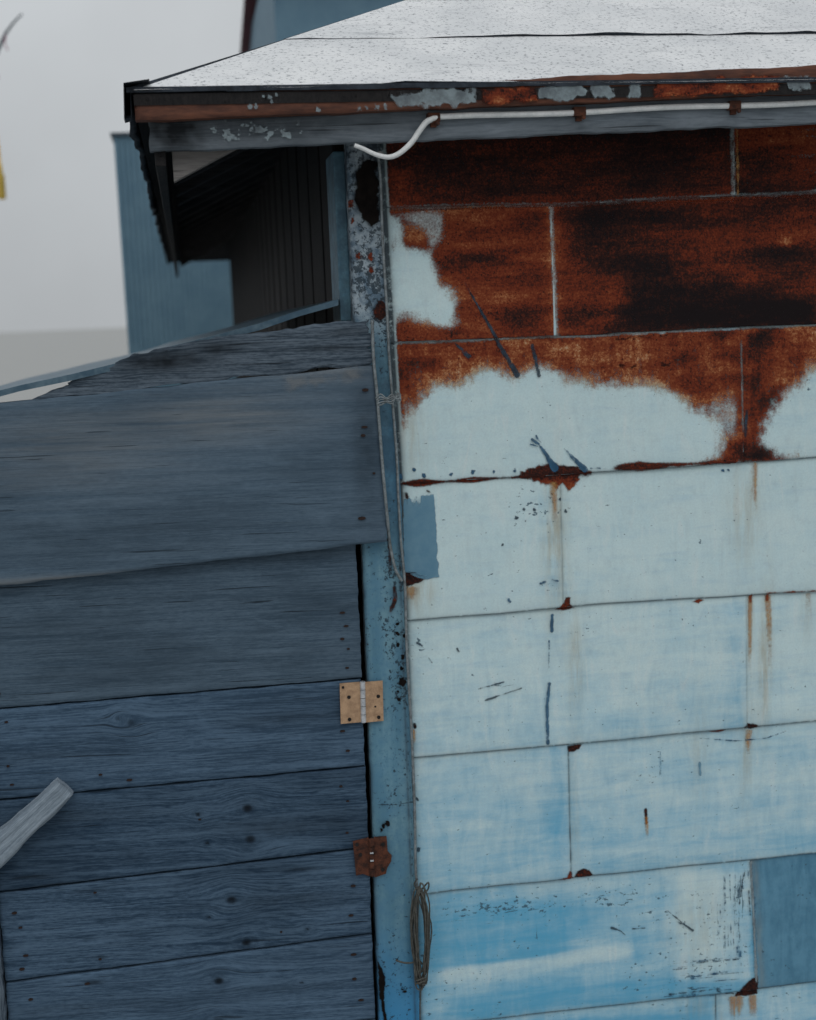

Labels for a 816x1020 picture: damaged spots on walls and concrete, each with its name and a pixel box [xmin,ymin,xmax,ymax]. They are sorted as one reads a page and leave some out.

peeling [358,87,476,110]
peeling [538,85,615,101]
peeling [628,84,641,98]
peeling [786,76,811,91]
peeling [354,160,380,227]
corrosion [373,124,816,496]
corrosion [401,463,592,511]
corrosion [766,590,815,626]
corrosion [730,978,758,1015]